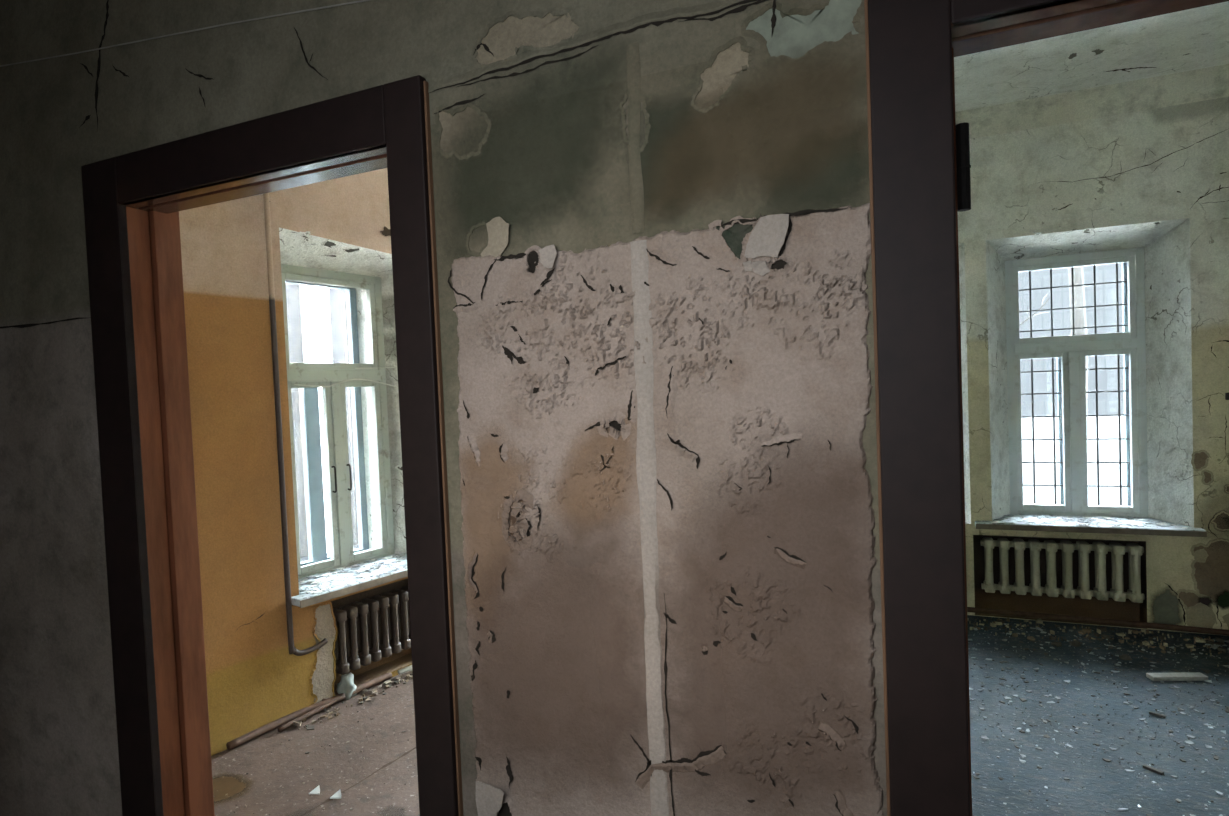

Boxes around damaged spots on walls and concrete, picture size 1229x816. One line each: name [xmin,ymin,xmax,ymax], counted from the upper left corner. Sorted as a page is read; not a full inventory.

crack [428,0,776,114]
peeling [689,0,865,116]
peeling [465,217,557,286]
peeling [708,208,846,277]
crack [448,258,552,393]
crack [564,246,729,376]
crack [627,366,700,469]
peeling [982,514,1186,528]
peeling [298,553,407,705]
damp [1151,588,1183,625]
damp [1199,590,1229,609]
crack [630,595,726,816]